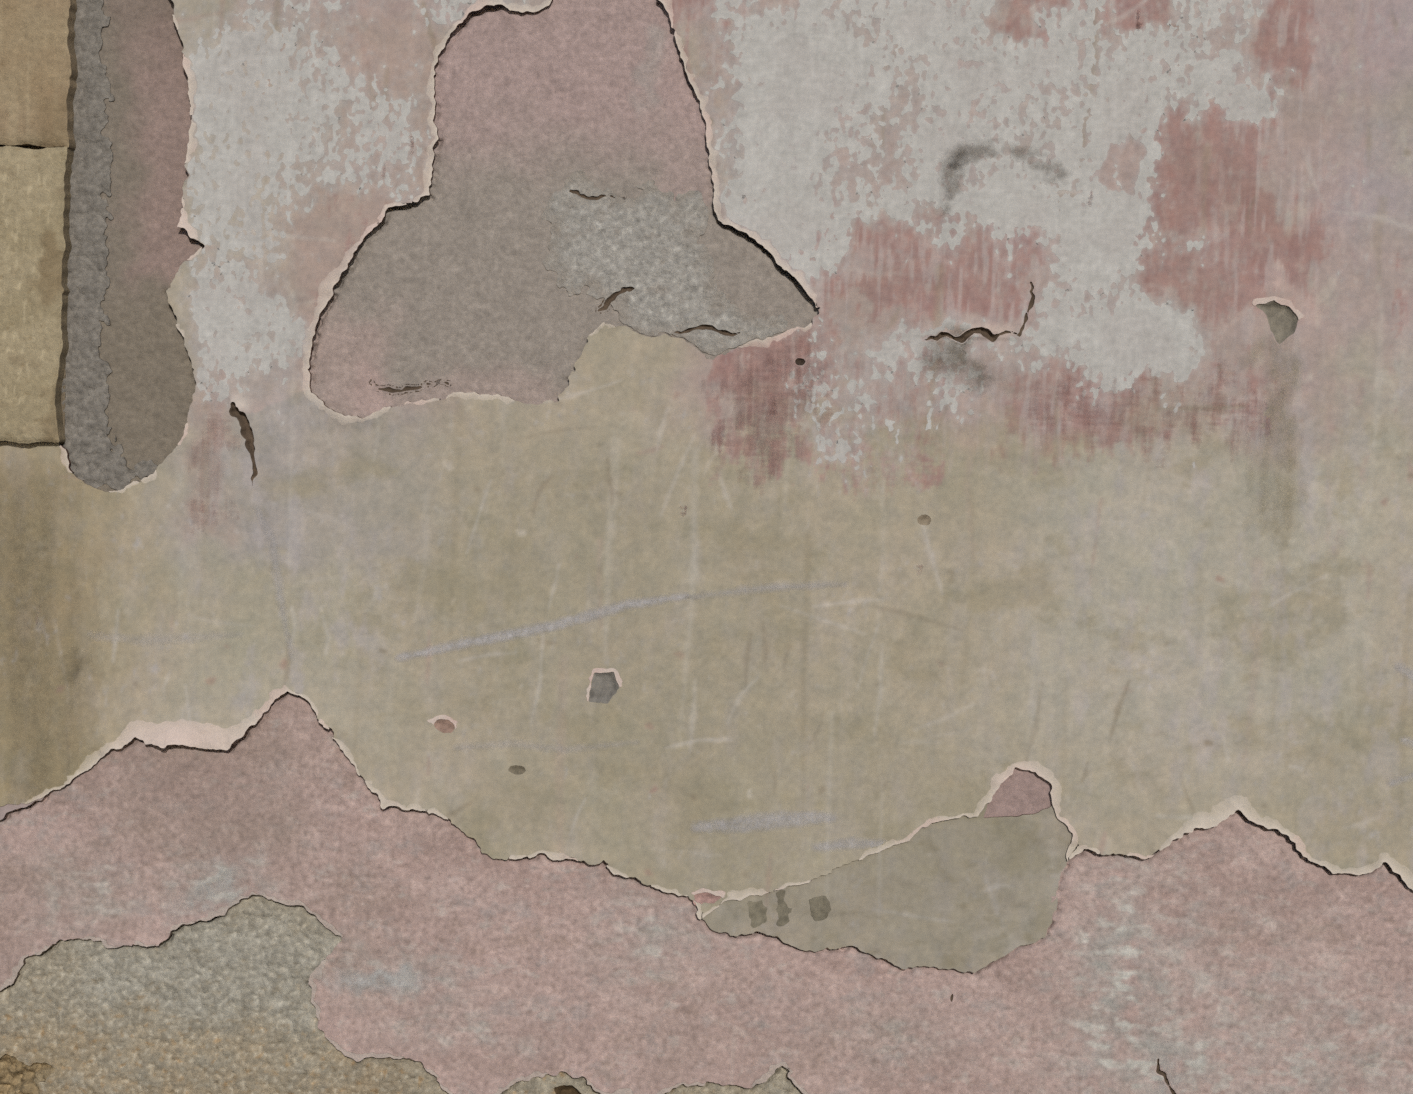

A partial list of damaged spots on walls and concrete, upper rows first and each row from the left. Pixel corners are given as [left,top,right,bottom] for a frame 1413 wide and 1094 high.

crack [925,282,1035,343]
peeling [1252,296,1304,344]
crack [230,402,258,482]
peeling [586,668,623,704]
peeling [0,685,1413,1094]